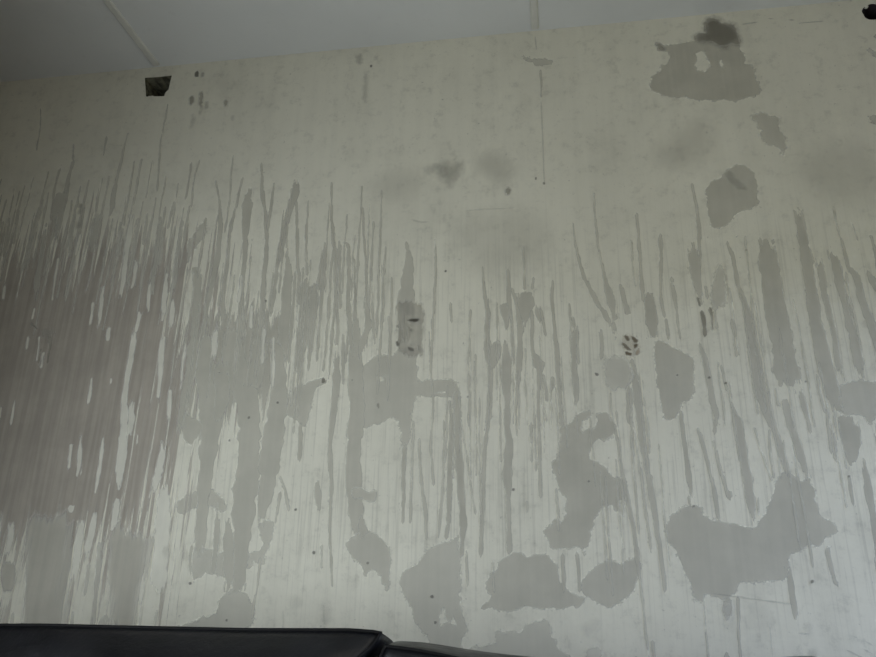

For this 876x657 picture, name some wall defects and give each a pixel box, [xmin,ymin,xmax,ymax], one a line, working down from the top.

peeling [649,19,762,102]
peeling [752,113,786,155]
peeling [705,164,760,229]
peeling [277,378,326,461]
peeling [346,314,642,657]
peeling [622,292,838,657]
peeling [839,379,876,566]
peeling [246,520,274,569]
peeling [182,589,255,628]